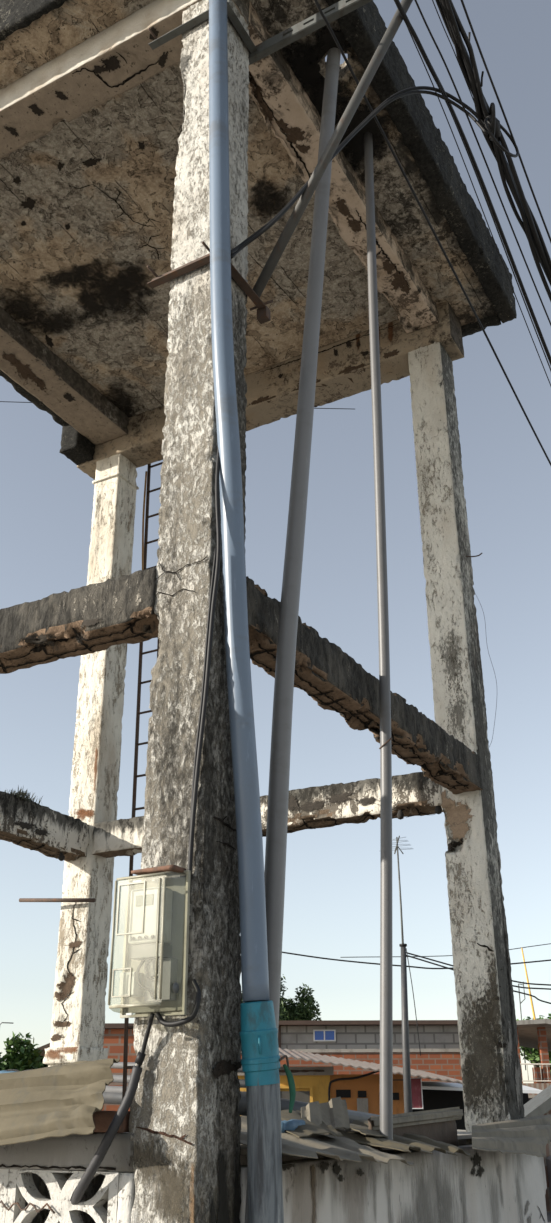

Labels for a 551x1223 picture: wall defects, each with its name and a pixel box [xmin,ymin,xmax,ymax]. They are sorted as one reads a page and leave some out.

crack [72,52,158,88]
spalling [249,73,311,154]
damp [251,177,291,221]
spalling [332,197,362,232]
damp [1,259,151,335]
spalling [383,260,411,295]
crack [155,556,207,605]
spalling [0,618,151,673]
spalling [287,670,474,852]
spalling [1,821,66,858]
crack [61,902,81,1028]
damp [458,947,510,1122]